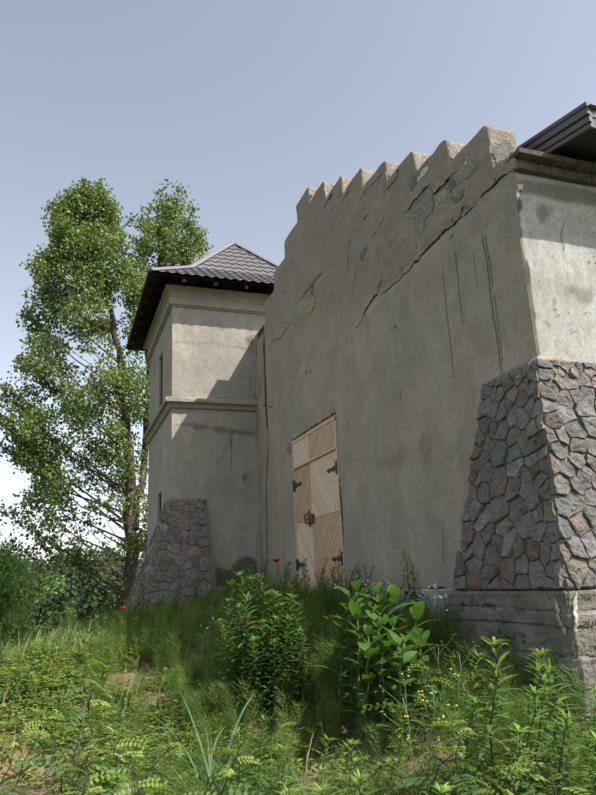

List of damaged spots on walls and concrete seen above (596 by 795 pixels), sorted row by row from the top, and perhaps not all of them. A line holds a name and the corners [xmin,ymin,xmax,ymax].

crack [324,170,398,246]
crack [407,165,481,211]
spalling [493,140,514,163]
crack [335,174,507,367]
leakage [481,234,503,368]